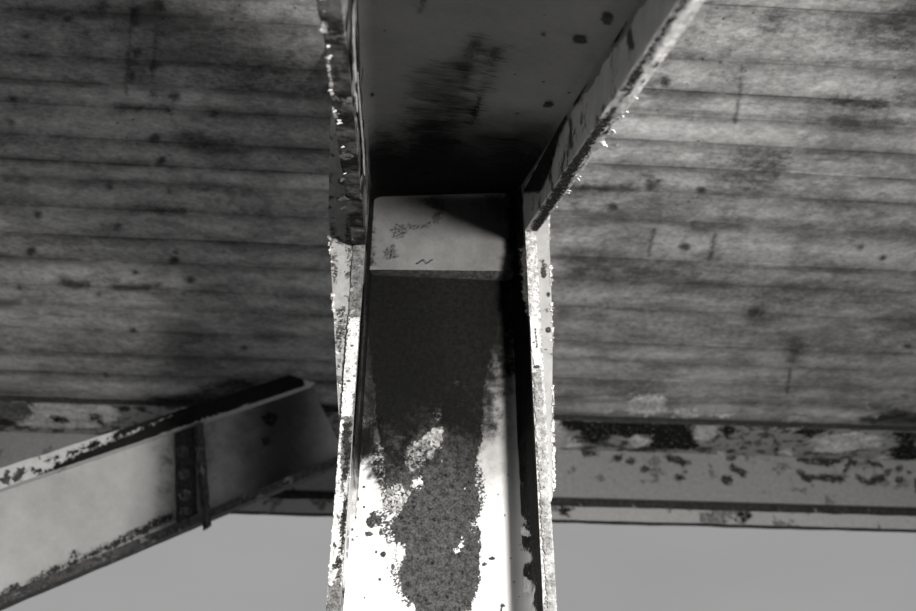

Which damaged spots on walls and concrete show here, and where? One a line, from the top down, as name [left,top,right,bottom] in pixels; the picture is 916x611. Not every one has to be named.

peeling [17,403,202,475]
peeling [806,431,890,460]